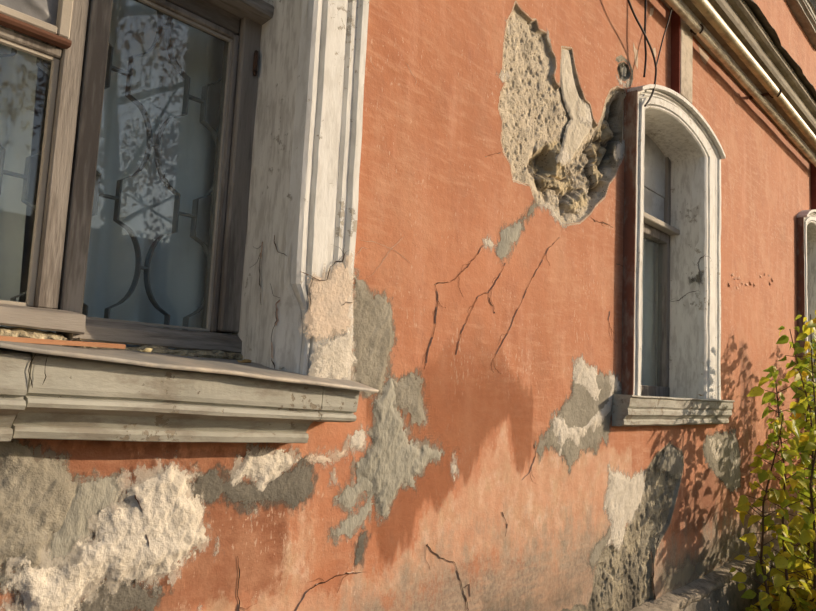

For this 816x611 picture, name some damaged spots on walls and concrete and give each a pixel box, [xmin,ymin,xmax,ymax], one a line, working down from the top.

spalling [498,1,638,228]
peeling [698,44,709,65]
crack [251,235,287,369]
crack [300,246,349,309]
spalling [305,253,358,380]
crack [422,237,560,371]
crack [425,544,471,611]
spalling [587,442,684,611]